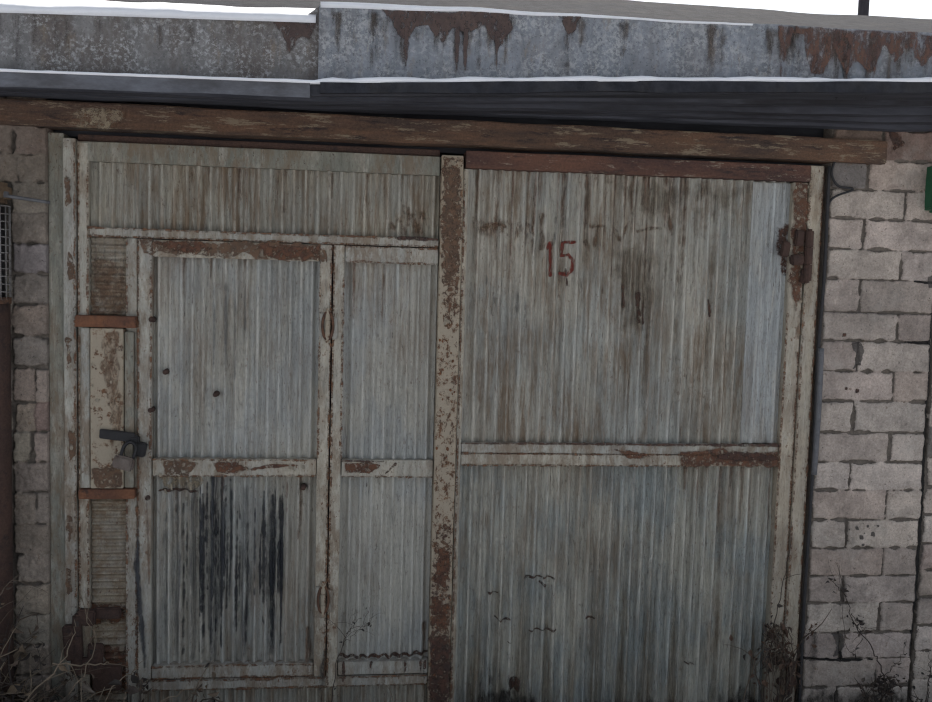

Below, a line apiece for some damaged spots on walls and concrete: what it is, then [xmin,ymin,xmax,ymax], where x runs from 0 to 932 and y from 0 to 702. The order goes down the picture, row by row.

rust [382,9,513,70]
rust [778,26,932,79]
peeling [91,331,122,446]
peeling [91,464,122,489]
rust [73,142,820,702]
damp [166,476,284,652]